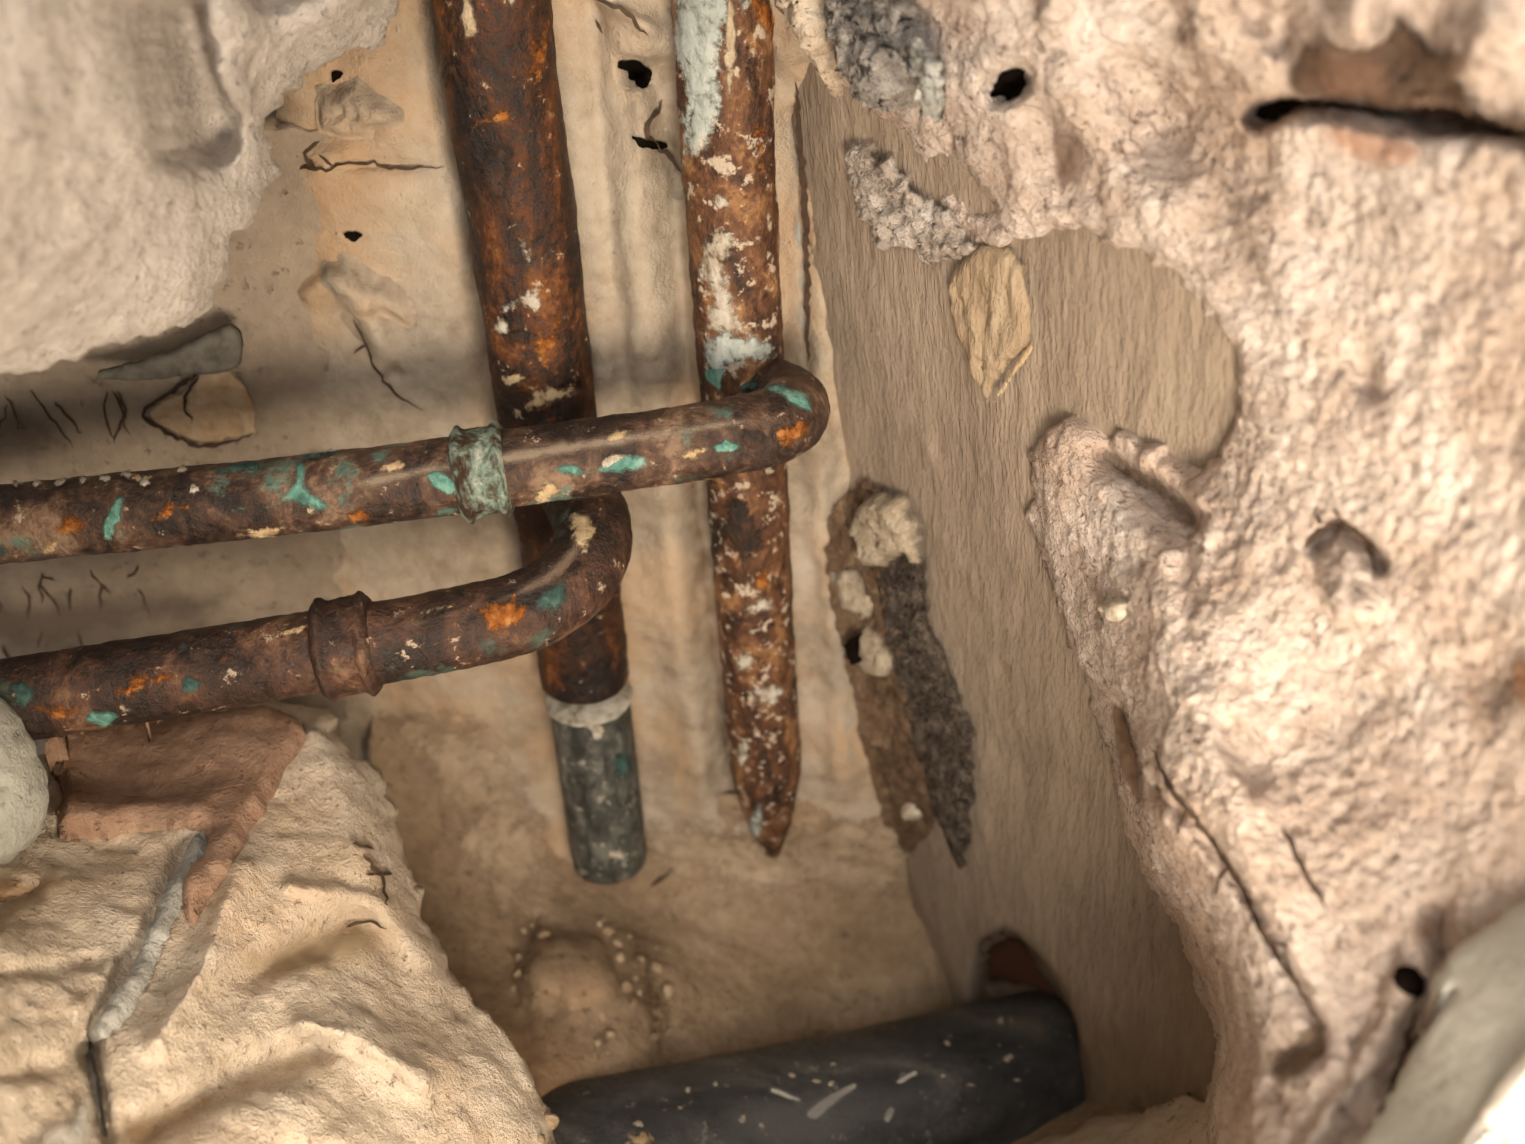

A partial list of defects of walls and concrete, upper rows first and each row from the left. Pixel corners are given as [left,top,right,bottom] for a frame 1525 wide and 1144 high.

crack [1255,98,1418,121]
crack [299,141,441,172]
spalling [1056,135,1083,183]
crack [352,320,422,410]
flaking render [948,245,1033,403]
crack [0,390,131,448]
crack [0,565,151,658]
spalling [824,479,976,869]
spalling [1113,708,1139,800]
crack [1150,746,1327,1029]